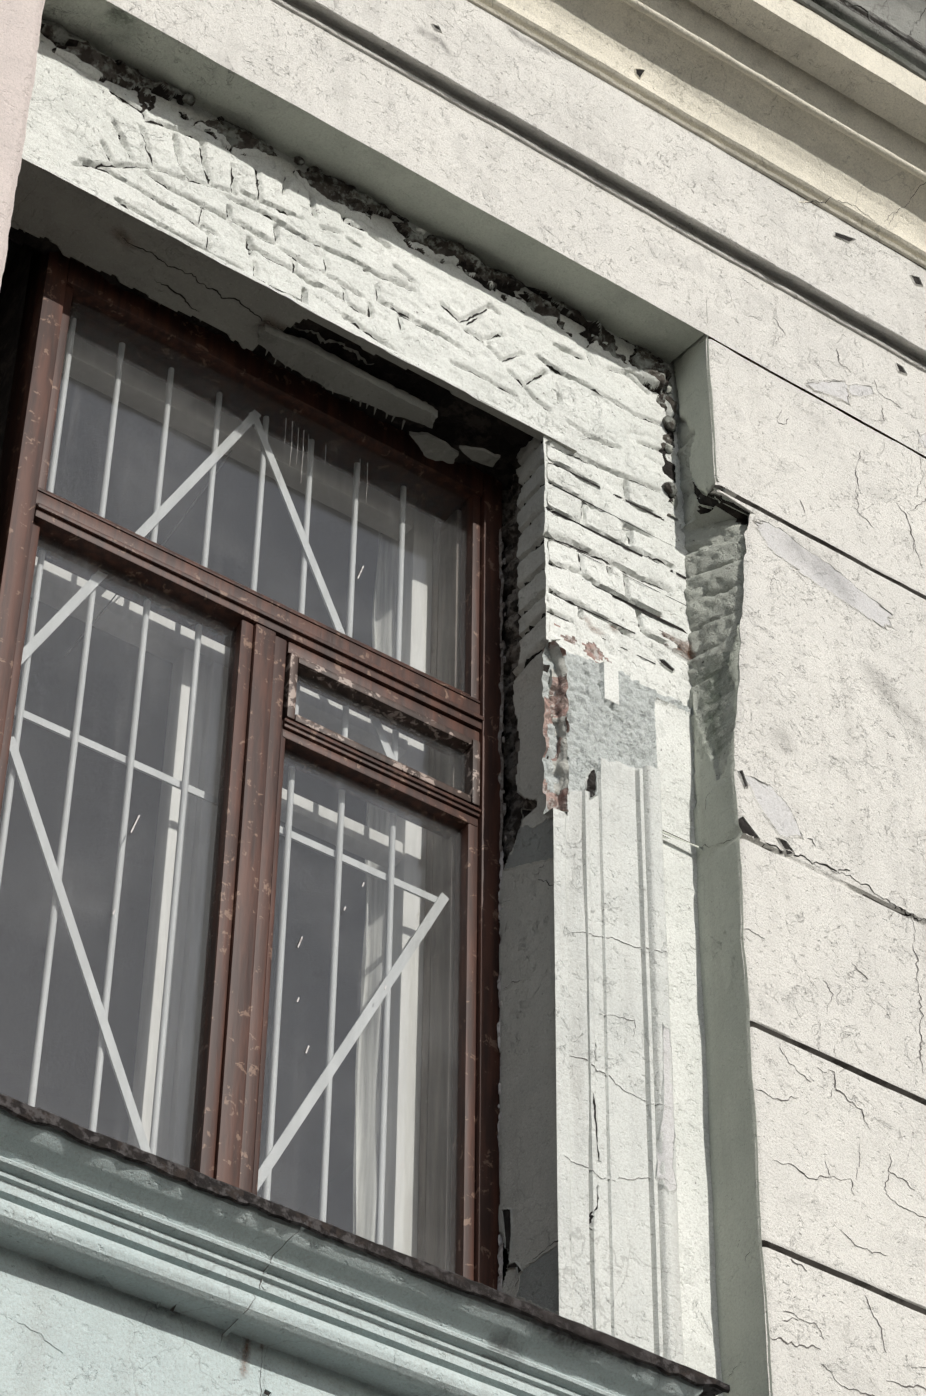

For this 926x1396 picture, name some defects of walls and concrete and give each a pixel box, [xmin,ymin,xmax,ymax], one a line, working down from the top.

flaking render [40,18,895,630]
crack [777,410,789,424]
crack [812,349,926,568]
spalling [657,658,675,674]
peeling [498,773,554,887]
spalling [584,769,597,800]
crack [662,785,926,1074]
crack [756,1043,926,1218]
crack [220,1222,306,1348]
crack [840,1228,887,1256]
crack [770,1295,926,1396]